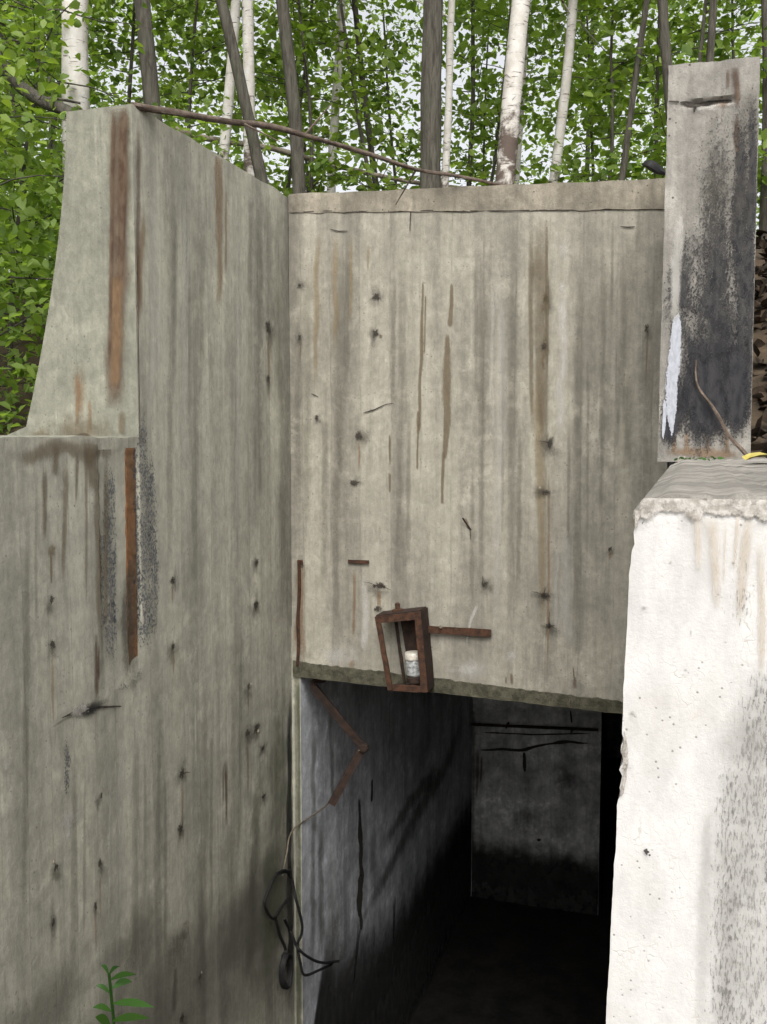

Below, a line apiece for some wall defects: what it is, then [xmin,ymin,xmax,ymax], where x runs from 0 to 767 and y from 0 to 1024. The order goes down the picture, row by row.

corrosion [108,113,140,397]
spalling [635,498,767,529]
crack [357,780,373,932]